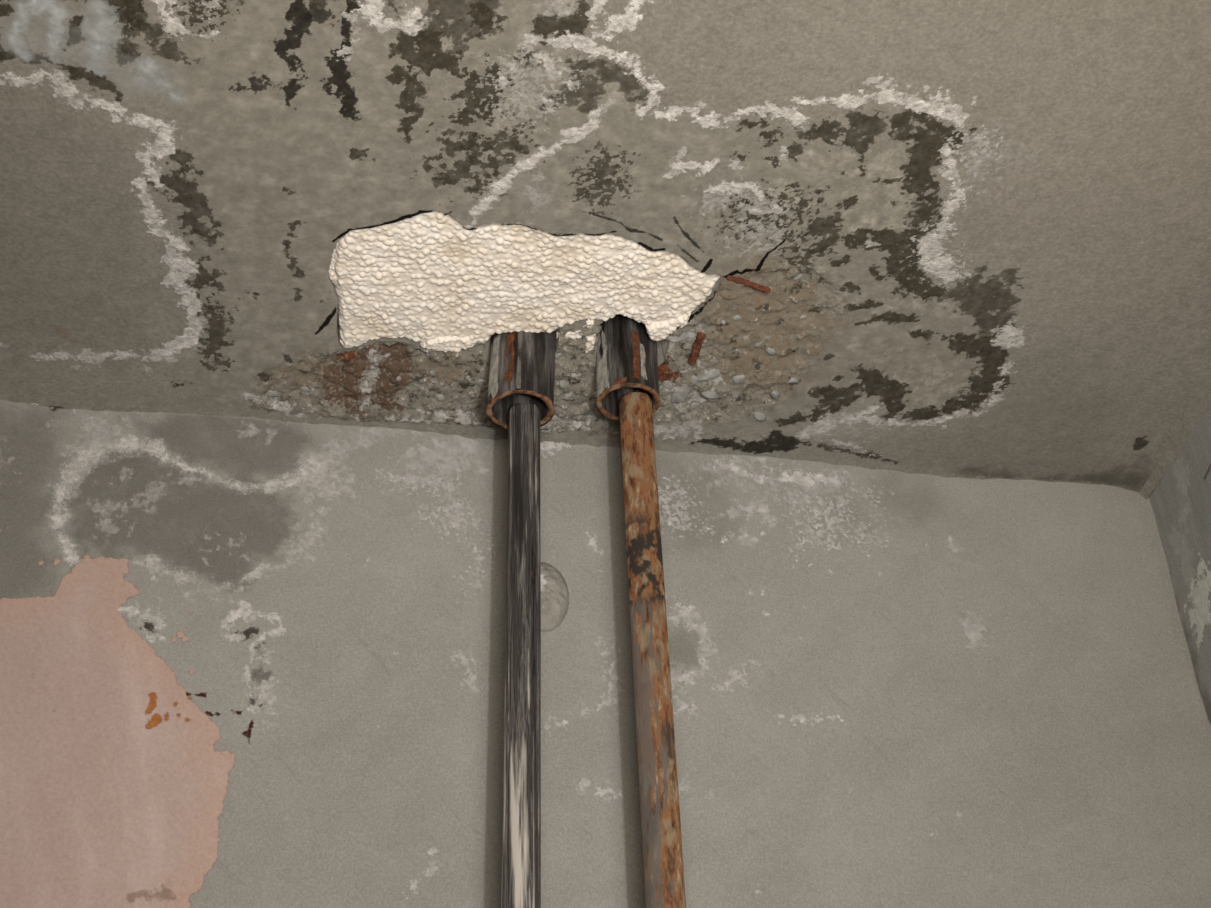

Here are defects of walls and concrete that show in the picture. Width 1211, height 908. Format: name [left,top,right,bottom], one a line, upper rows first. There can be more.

water stain [0,0,242,376]
crack [315,308,337,334]
spalling [248,342,499,427]
corrosion [502,331,516,386]
crack [332,210,786,335]
spalling [540,325,621,436]
corrosion [615,332,640,384]
water stain [229,0,1033,574]
corrosion [658,355,682,383]
spalling [653,257,851,426]
water stain [32,403,355,603]
peeling [118,602,189,643]